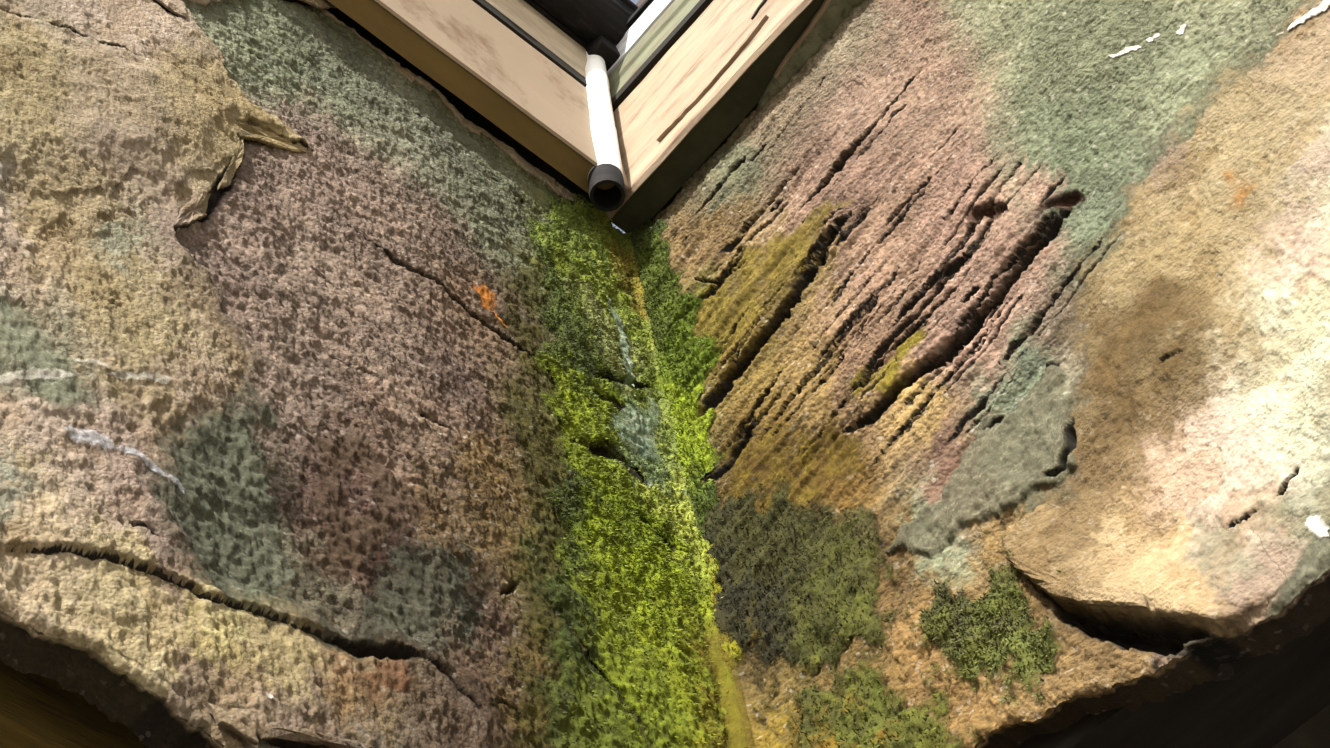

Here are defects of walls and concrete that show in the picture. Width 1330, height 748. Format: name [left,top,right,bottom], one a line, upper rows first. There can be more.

water stain [1109,33,1159,58]
water stain [1276,0,1330,35]
peeling [151,0,657,748]
rust [473,285,507,328]
water stain [608,299,657,459]
crack [703,202,860,415]
crack [842,189,1083,433]
peeling [654,0,1330,748]
crack [1038,417,1077,477]
peeling [636,512,682,551]
crack [11,521,522,719]
water stain [695,629,753,748]